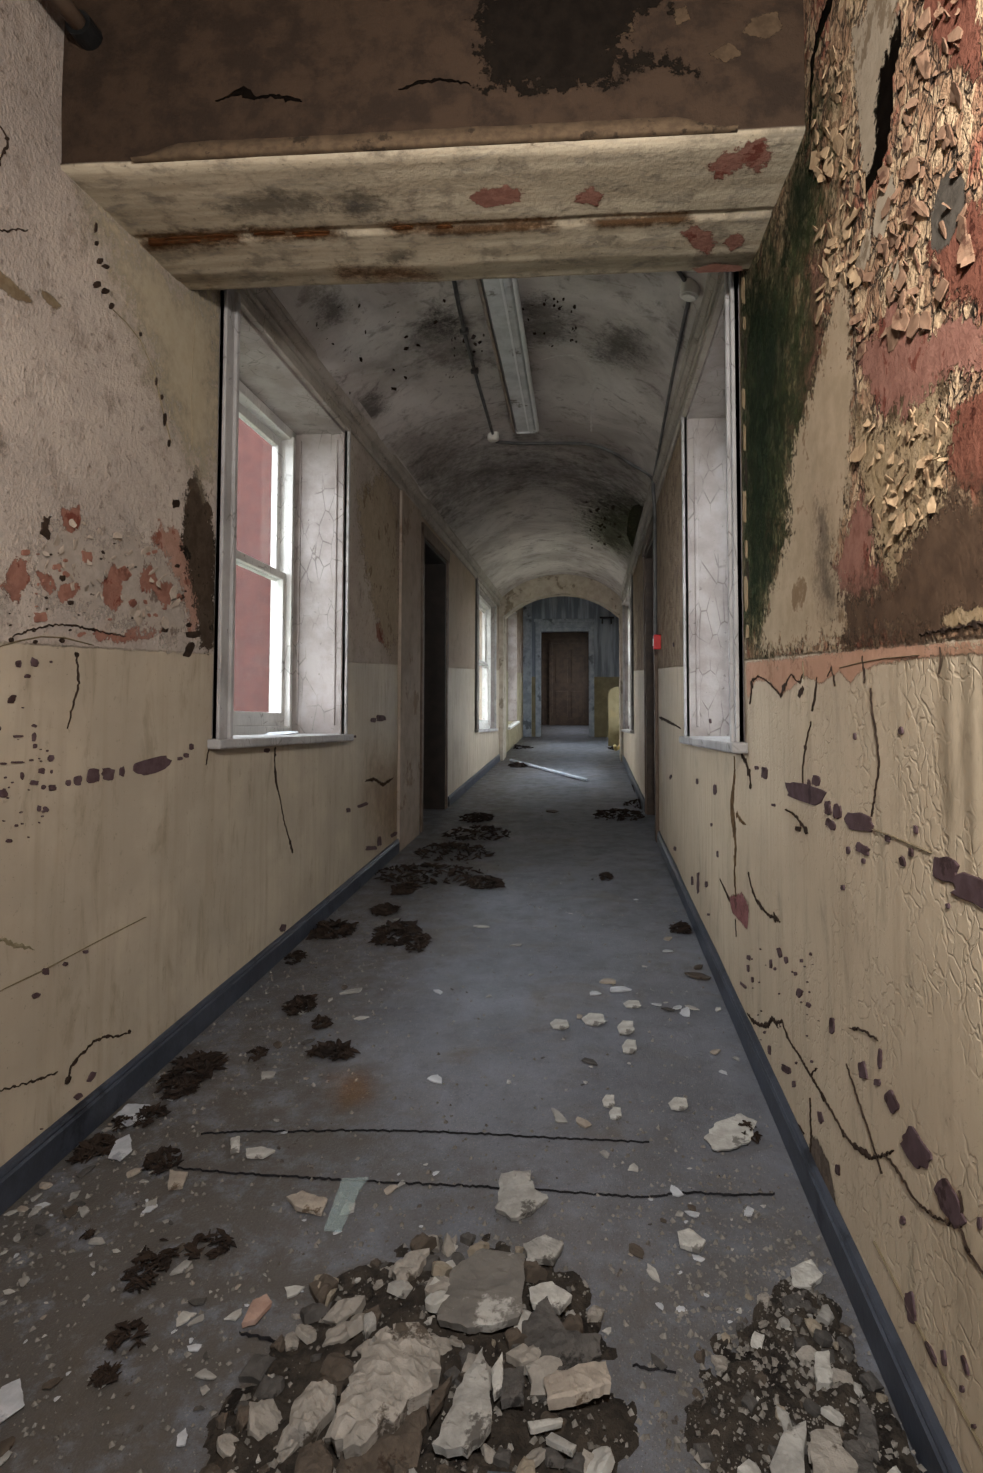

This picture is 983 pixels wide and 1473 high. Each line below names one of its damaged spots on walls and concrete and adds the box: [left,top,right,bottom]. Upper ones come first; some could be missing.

crack [865,9,901,194]
peeling [469,183,525,208]
peeling [93,222,172,447]
leakage [522,298,577,347]
peeling [680,224,747,370]
leakage [740,84,845,661]
peeling [742,0,983,712]
leakage [582,494,644,555]
crack [0,623,125,729]
crack [861,656,880,817]
crack [177,1128,649,1190]
crack [747,1013,983,1274]